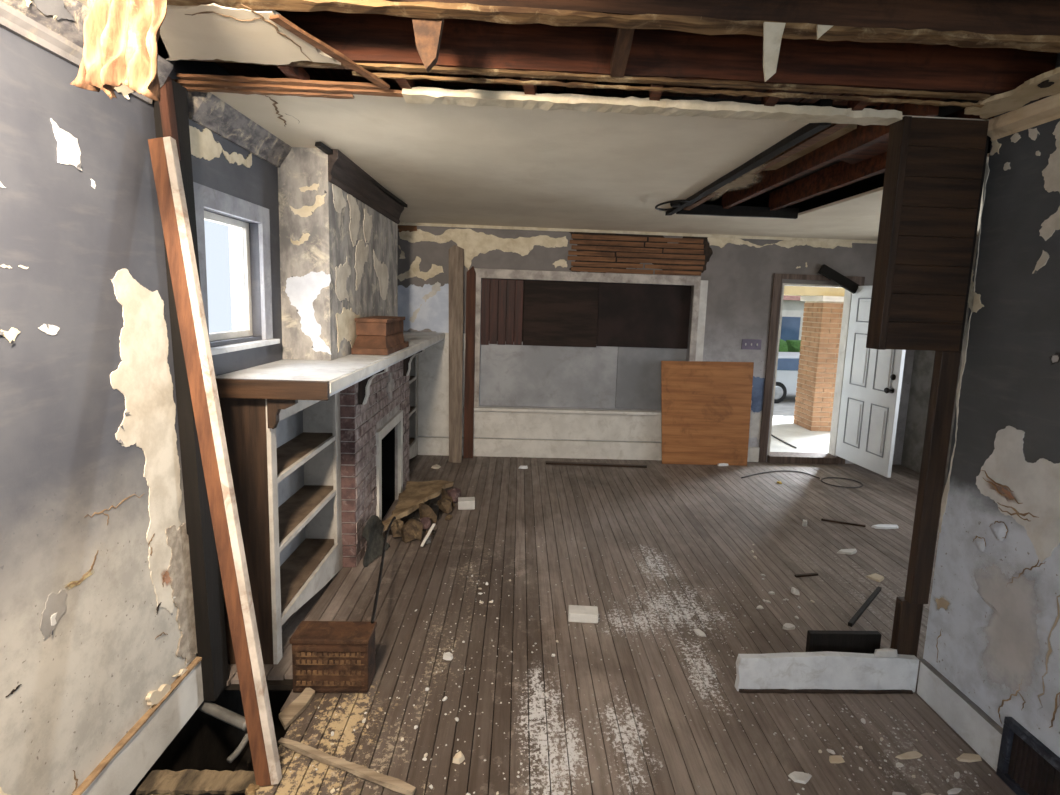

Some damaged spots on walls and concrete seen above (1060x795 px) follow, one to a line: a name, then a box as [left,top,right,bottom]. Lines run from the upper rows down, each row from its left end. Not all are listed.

peeling [0,327,20,346]
peeling [38,324,60,335]
flaking render [285,183,852,355]
peeling [938,121,1060,533]
peeling [110,269,197,709]
peeling [976,426,1060,563]
crack [1006,559,1045,587]
crack [998,682,1026,724]